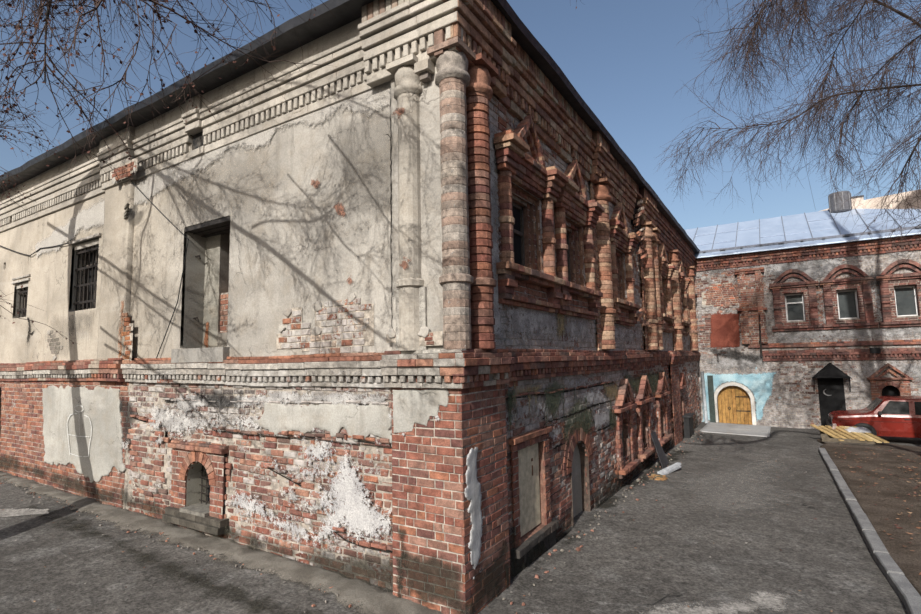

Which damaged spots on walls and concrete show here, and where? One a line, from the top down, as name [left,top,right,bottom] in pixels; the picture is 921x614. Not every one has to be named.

flaking render [110,157,138,185]
flaking render [276,278,374,354]
peeling [130,389,393,556]